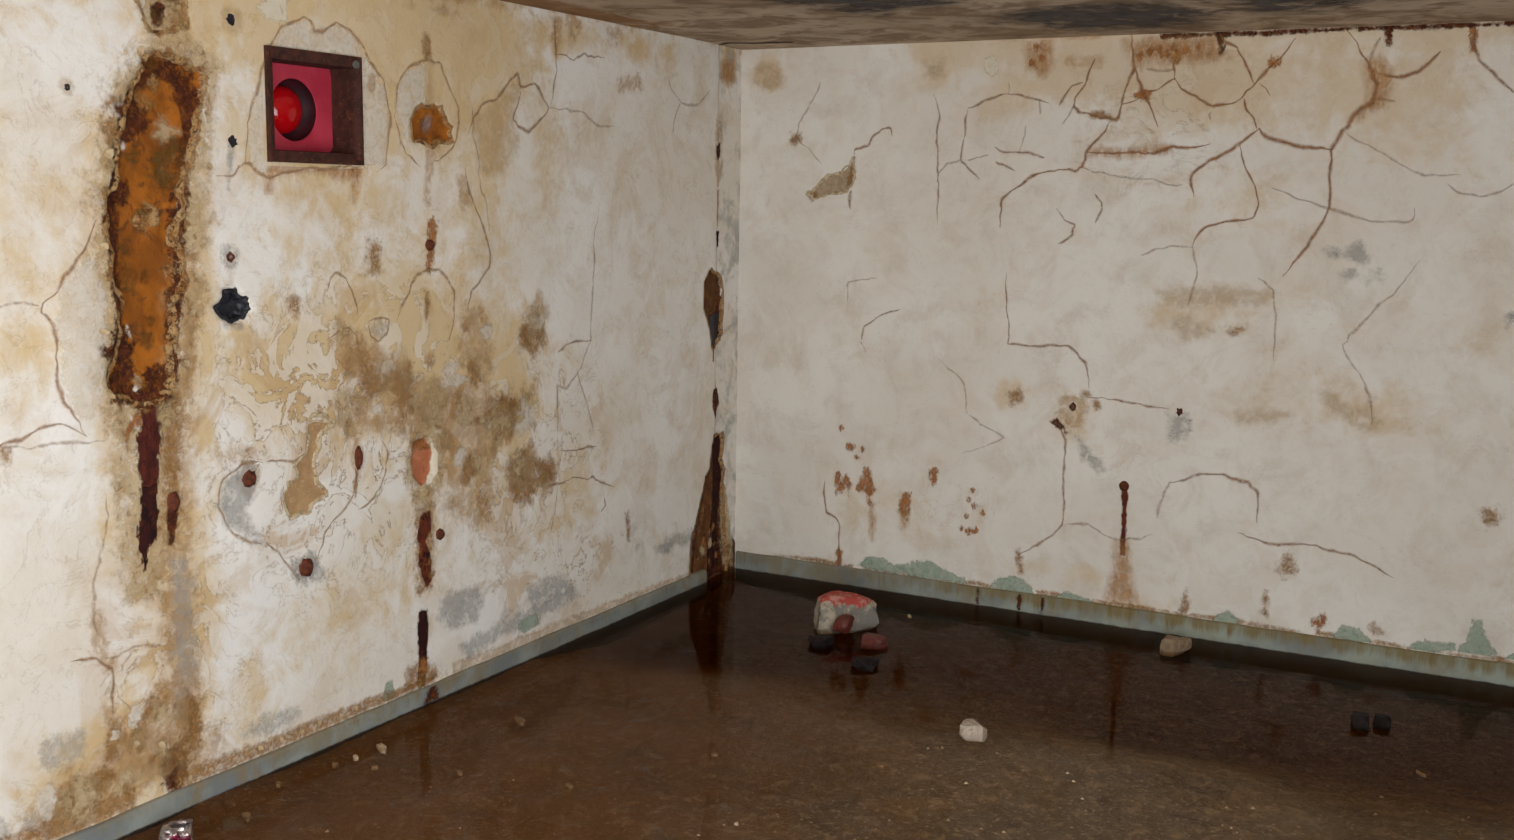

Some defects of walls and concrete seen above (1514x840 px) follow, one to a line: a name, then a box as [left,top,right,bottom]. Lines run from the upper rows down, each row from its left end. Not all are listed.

spalling [93,0,251,440]
peeling [230,17,459,188]
rust [410,103,454,149]
mould [1000,4,1203,30]
crack [933,30,1513,277]
crack [0,223,108,446]
spalling [703,268,724,361]
rust [112,387,178,600]
water stain [335,357,555,504]
crack [1172,474,1393,578]
rust [159,503,439,792]
water stain [36,696,204,823]